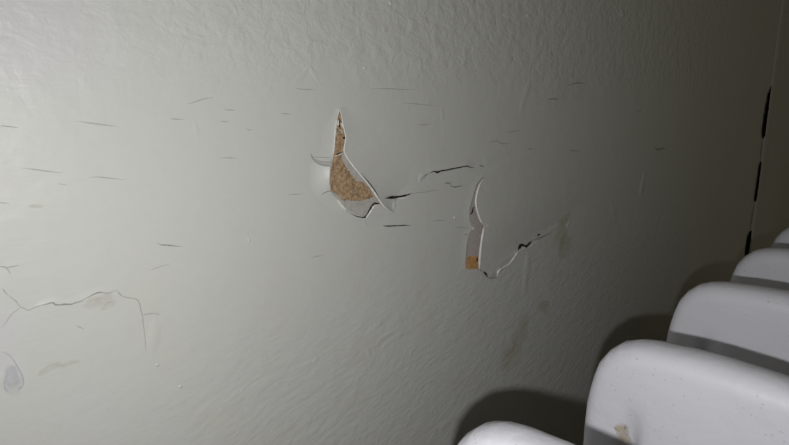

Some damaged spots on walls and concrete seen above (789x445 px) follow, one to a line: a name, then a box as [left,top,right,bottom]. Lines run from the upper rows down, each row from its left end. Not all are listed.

peeling [309,106,412,228]
crack [385,158,484,199]
peeling [459,137,604,279]
crack [745,86,772,256]
crack [0,265,159,348]